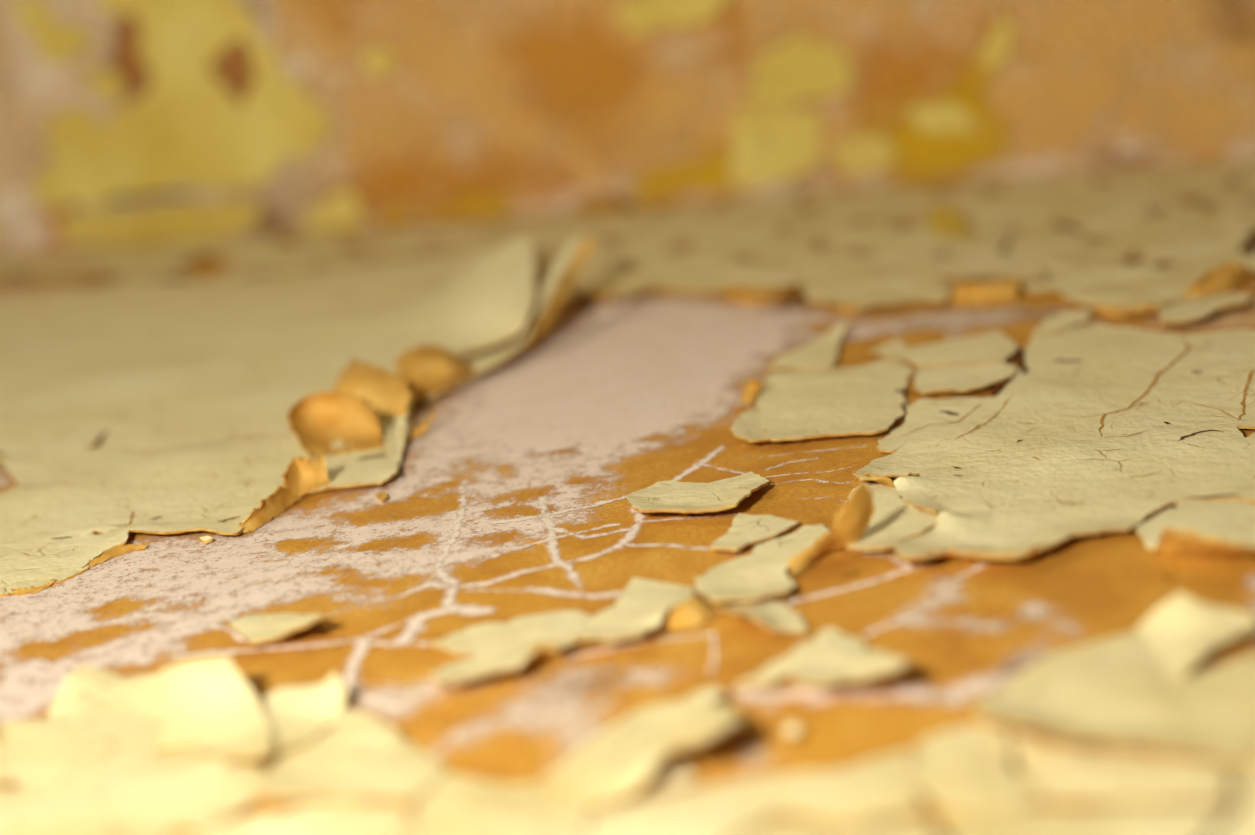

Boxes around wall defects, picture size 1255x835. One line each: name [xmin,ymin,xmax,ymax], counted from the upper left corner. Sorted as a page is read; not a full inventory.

peeling [15,0,92,64]
peeling [30,0,332,210]
peeling [728,36,897,189]
peeling [907,102,980,134]
peeling [0,159,1255,689]
crack [674,344,1082,502]
crack [1055,338,1255,441]
crack [1171,477,1255,509]
crack [169,480,744,712]
crack [786,552,986,604]
crack [863,614,918,636]
peeling [0,592,1255,835]